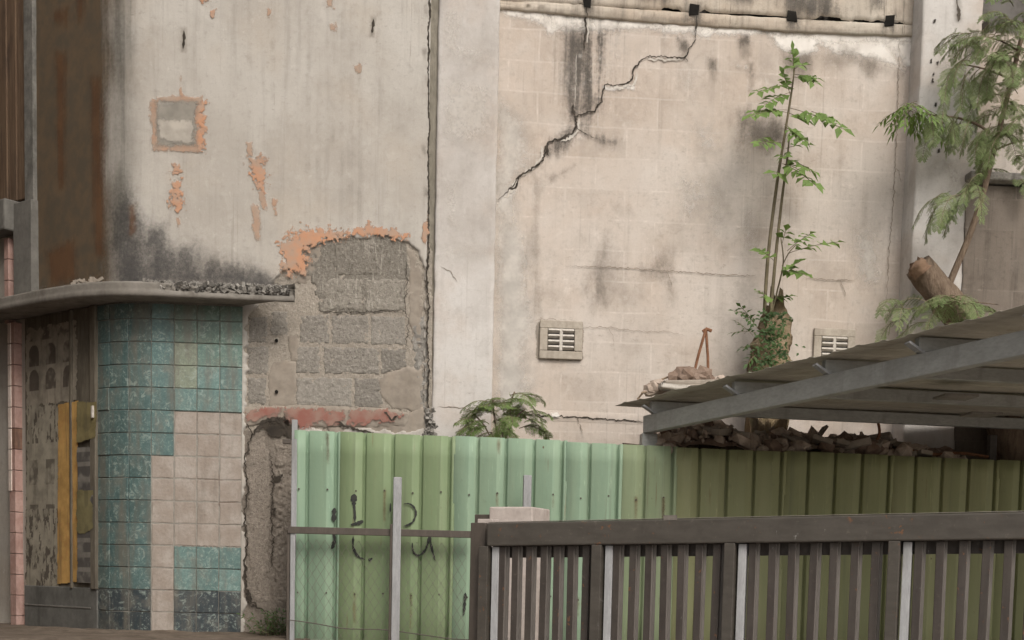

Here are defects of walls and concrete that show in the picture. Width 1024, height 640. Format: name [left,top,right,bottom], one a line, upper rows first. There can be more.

leakage [36,0,266,290]
peeling [149,78,210,225]
peeling [247,142,278,215]
crack [576,7,589,58]
crack [498,18,698,207]
leakage [503,10,911,109]
spalling [142,215,438,611]